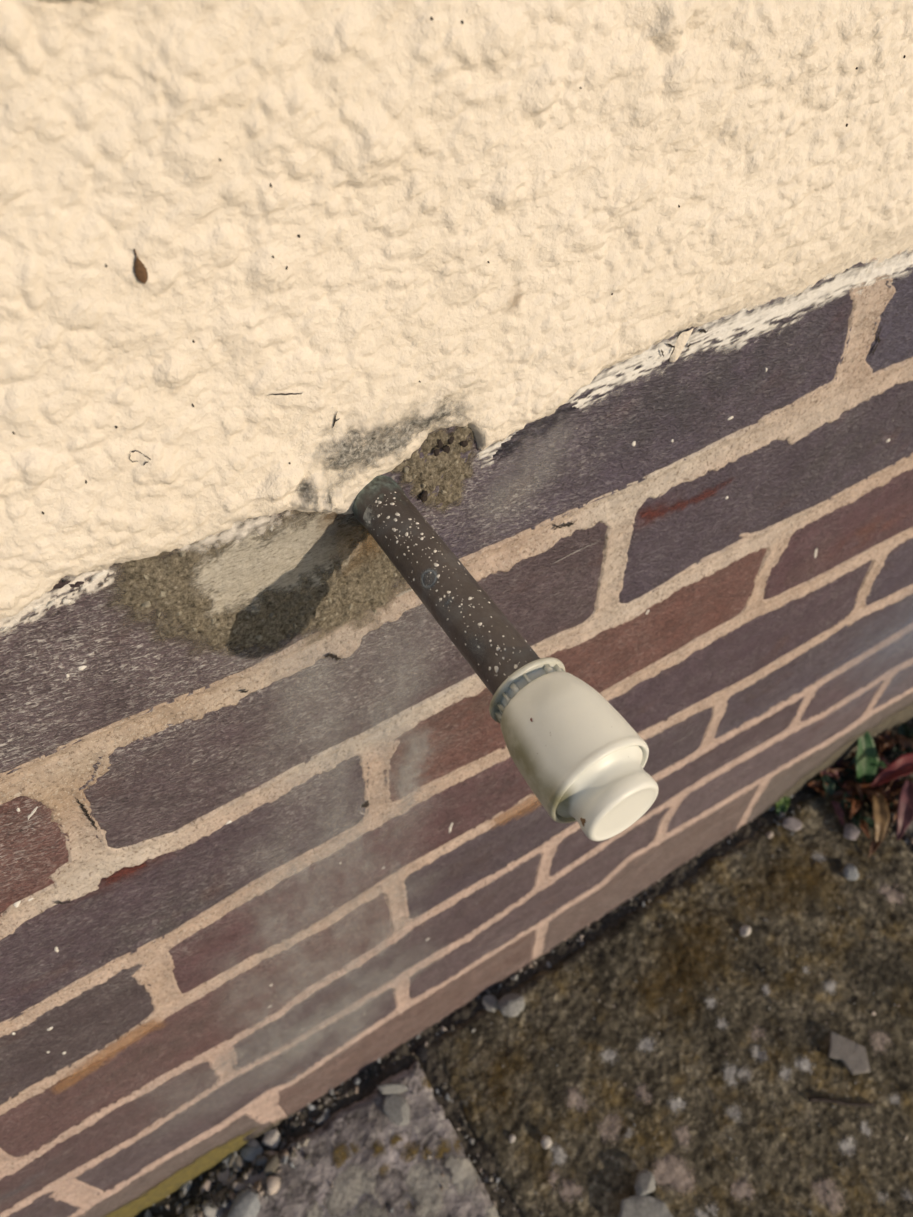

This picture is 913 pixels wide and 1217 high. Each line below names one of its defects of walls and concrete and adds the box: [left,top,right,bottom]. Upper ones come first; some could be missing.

spalling [392,425,475,511]
spalling [0,480,410,655]